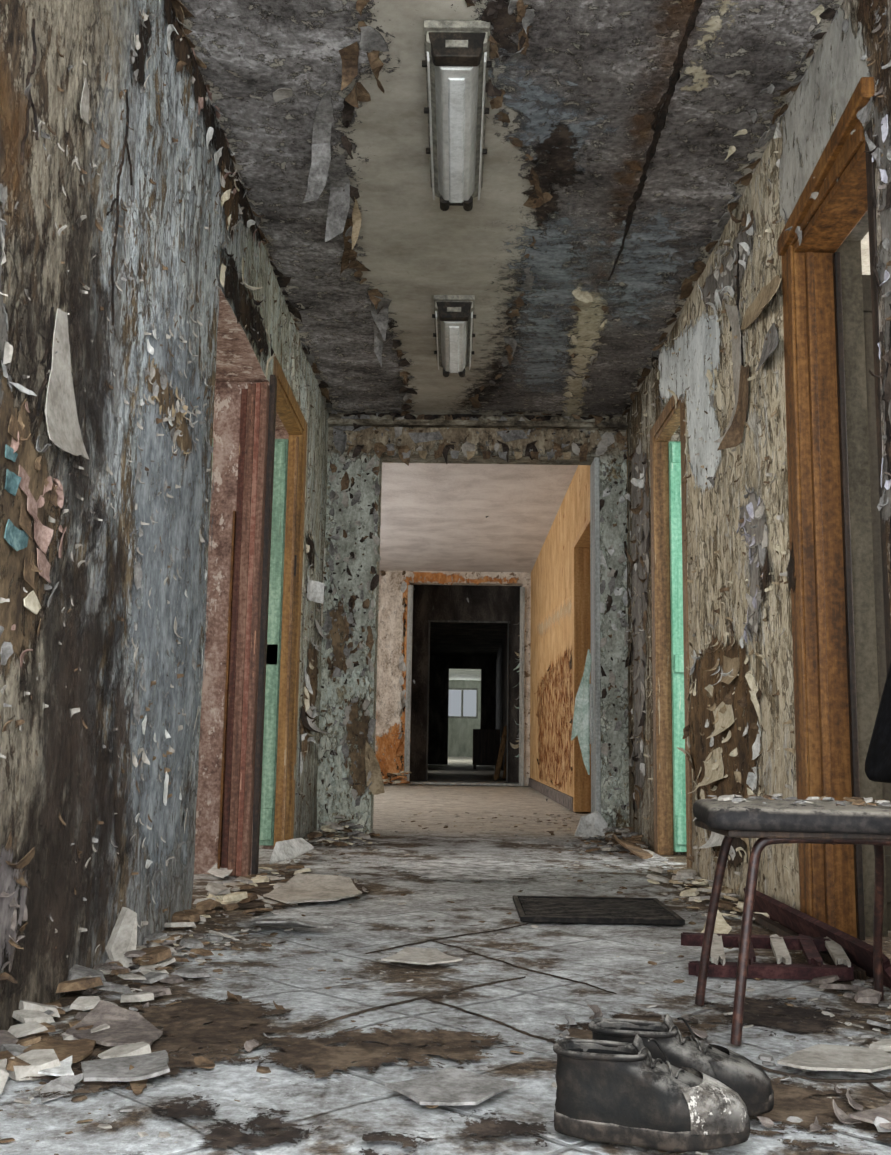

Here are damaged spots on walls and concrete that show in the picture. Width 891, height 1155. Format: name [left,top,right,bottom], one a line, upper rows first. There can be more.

peeling [57,49,110,149]
peeling [33,118,100,199]
peeling [52,193,158,240]
peeling [97,0,891,928]
peeling [71,838,98,880]
peeling [244,1033,273,1053]
crack [302,923,617,1044]
peeling [560,1004,603,1037]